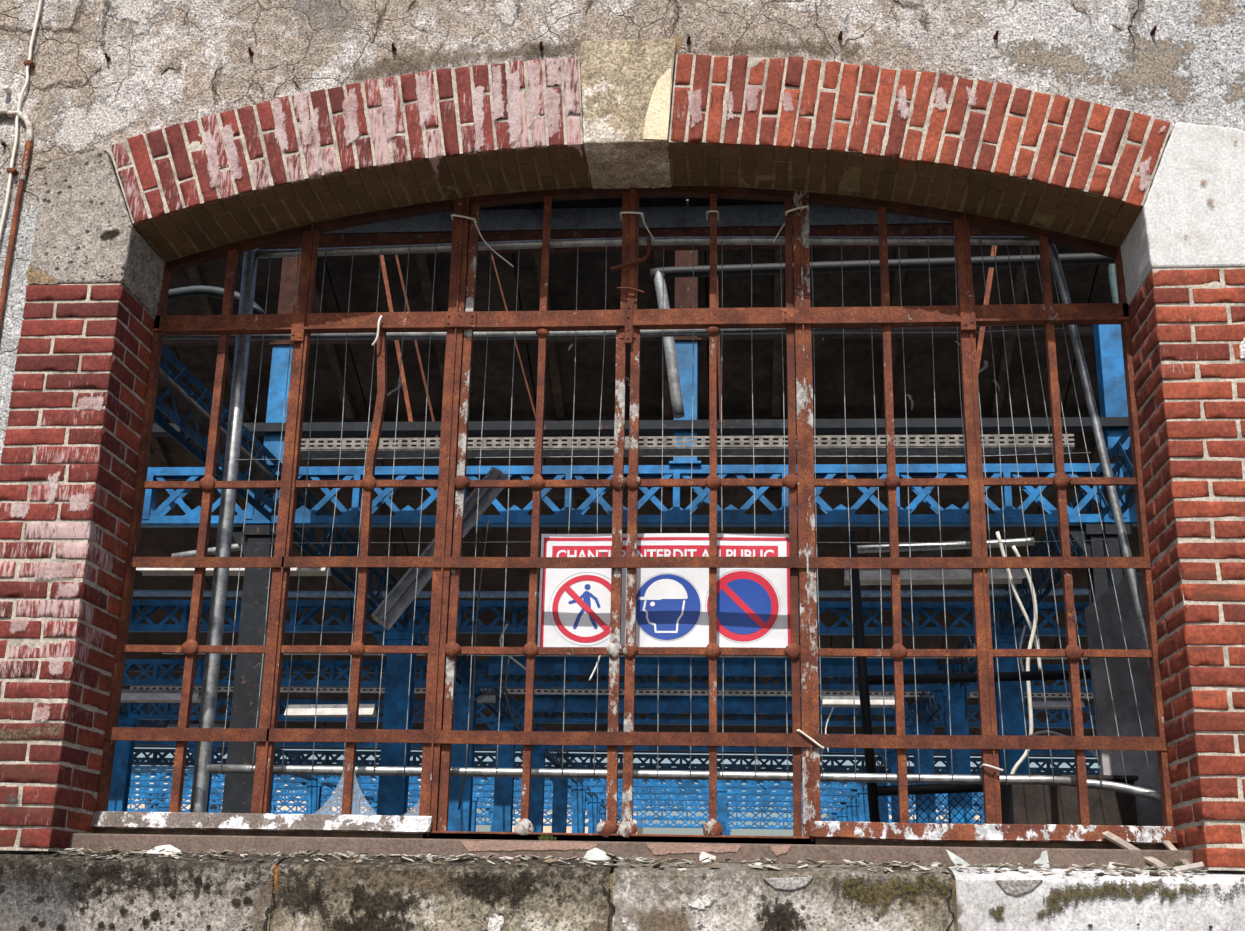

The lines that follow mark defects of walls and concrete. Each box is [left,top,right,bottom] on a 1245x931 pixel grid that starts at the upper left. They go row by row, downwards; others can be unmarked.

crack [1,0,113,90]
crack [1072,0,1139,68]
mould [0,850,186,931]
damp [271,859,536,931]
damp [627,900,692,931]
mould [754,894,809,931]